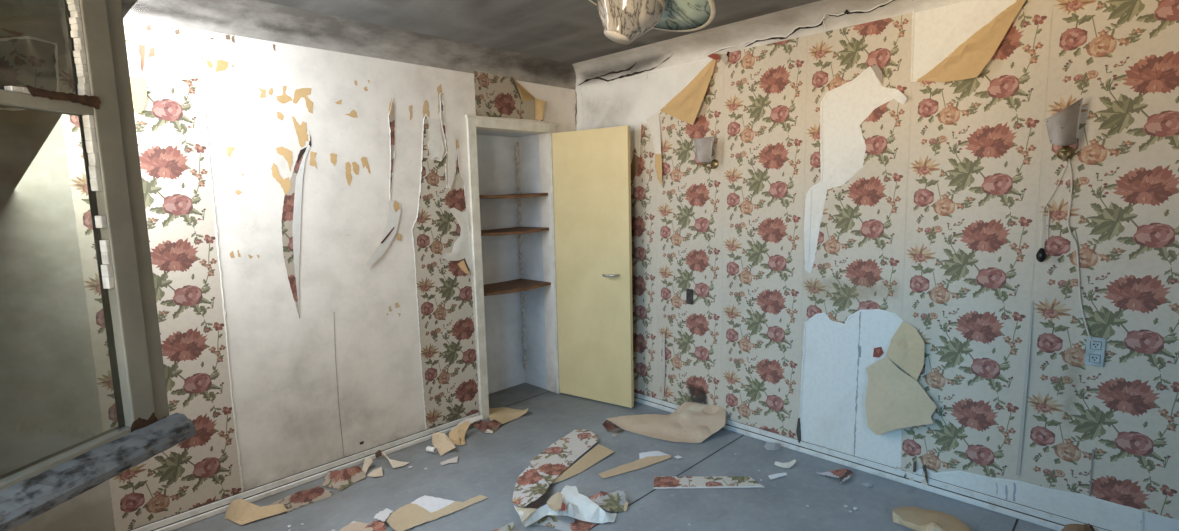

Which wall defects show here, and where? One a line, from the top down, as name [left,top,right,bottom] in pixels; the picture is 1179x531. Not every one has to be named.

peeling [201,57,235,72]
peeling [258,86,370,195]
peeling [409,84,443,120]
crack [575,55,672,116]
flaking render [581,58,712,182]
crack [709,0,913,55]
peeling [804,64,908,274]
peeling [911,0,1026,82]
peeling [796,309,937,468]
peeling [913,468,1144,531]